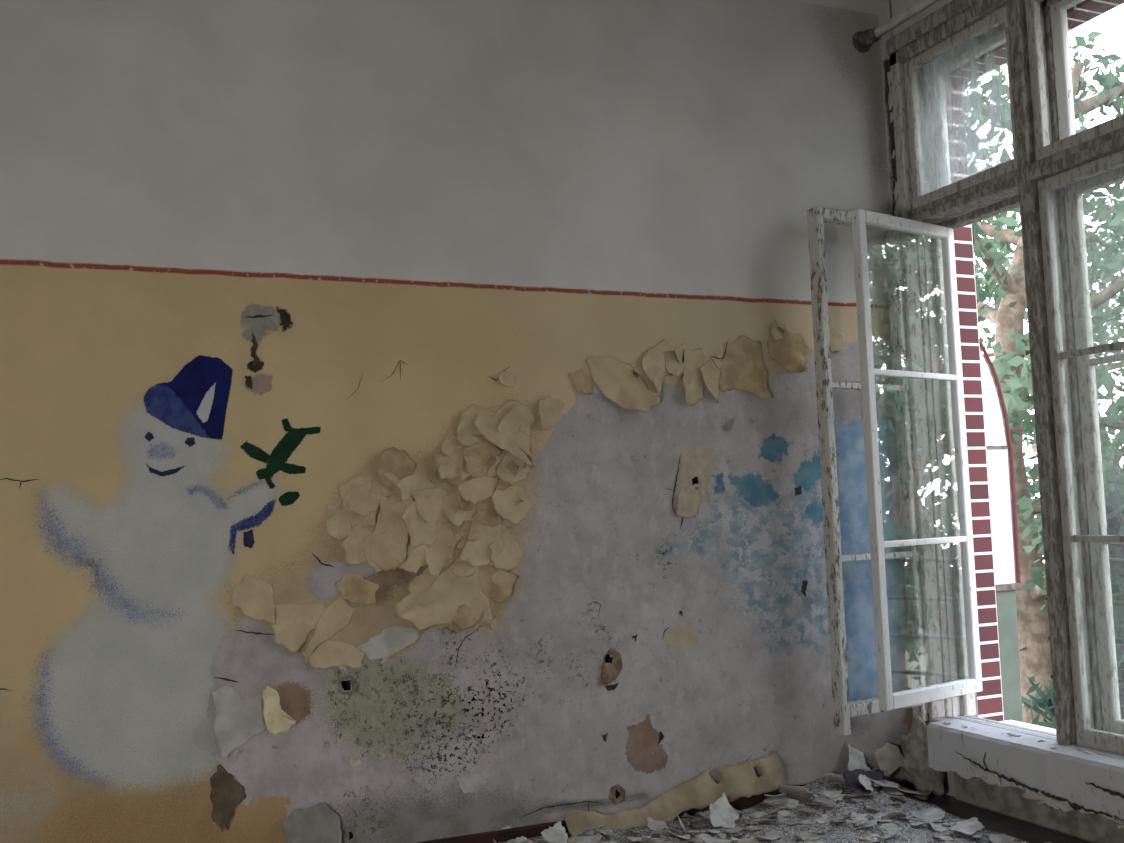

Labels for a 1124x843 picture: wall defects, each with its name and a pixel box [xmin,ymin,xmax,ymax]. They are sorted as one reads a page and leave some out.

flaking render [239,304,294,395]
leakage [273,436,616,843]
peeling [207,320,946,843]
crack [955,750,1124,829]